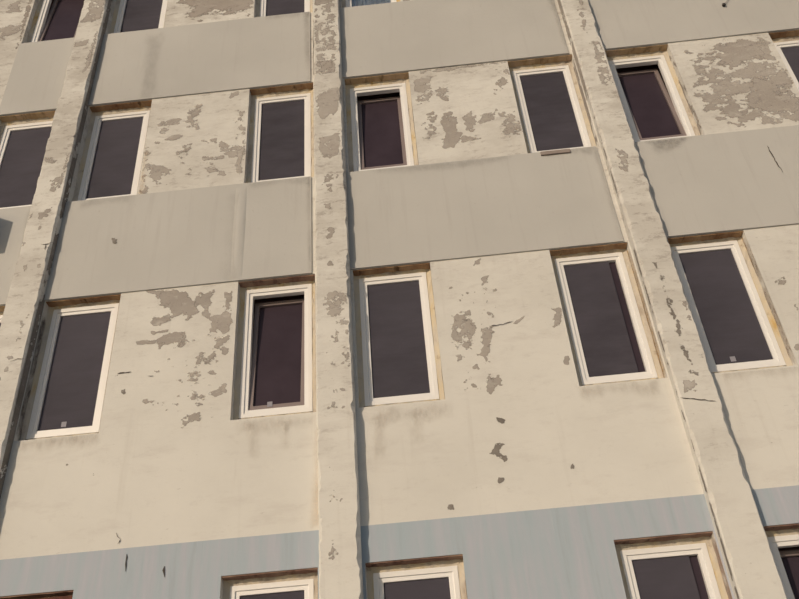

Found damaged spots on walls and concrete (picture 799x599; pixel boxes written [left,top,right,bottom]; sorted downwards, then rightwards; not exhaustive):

peeling [176,0,253,22]
peeling [314,0,336,75]
spalling [31,0,112,230]
peeling [141,105,246,194]
peeling [316,88,340,119]
peeling [411,62,521,149]
peeling [615,148,628,171]
peeling [678,37,799,135]
peeling [147,289,233,428]
peeling [323,291,350,367]
peeling [451,310,494,369]
peeling [464,374,502,394]